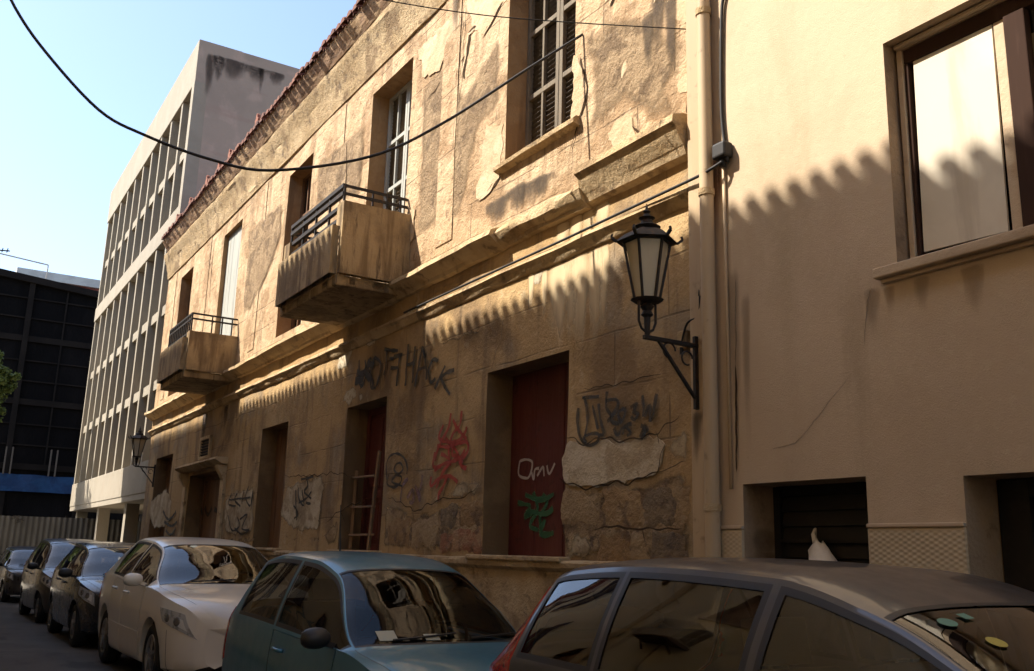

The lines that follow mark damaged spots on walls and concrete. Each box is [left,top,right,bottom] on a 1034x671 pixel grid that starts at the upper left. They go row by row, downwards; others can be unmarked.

damp [207,55,284,82]
damp [486,173,550,216]
spalling [561,476,691,561]